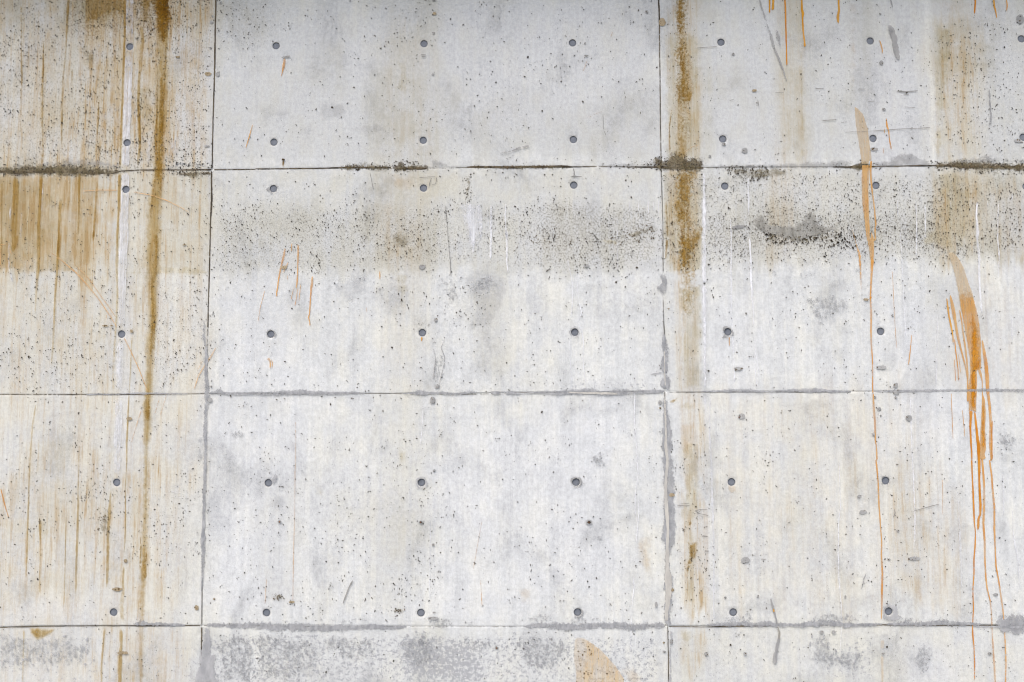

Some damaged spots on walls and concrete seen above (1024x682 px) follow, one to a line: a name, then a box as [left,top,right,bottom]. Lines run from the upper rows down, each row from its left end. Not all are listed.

corrosion [145,0,171,38]
corrosion [769,0,787,65]
corrosion [664,172,701,266]
leakage [730,213,862,249]
corrosion [855,107,892,405]
corrosion [902,182,1023,678]
corrosion [874,425,883,619]